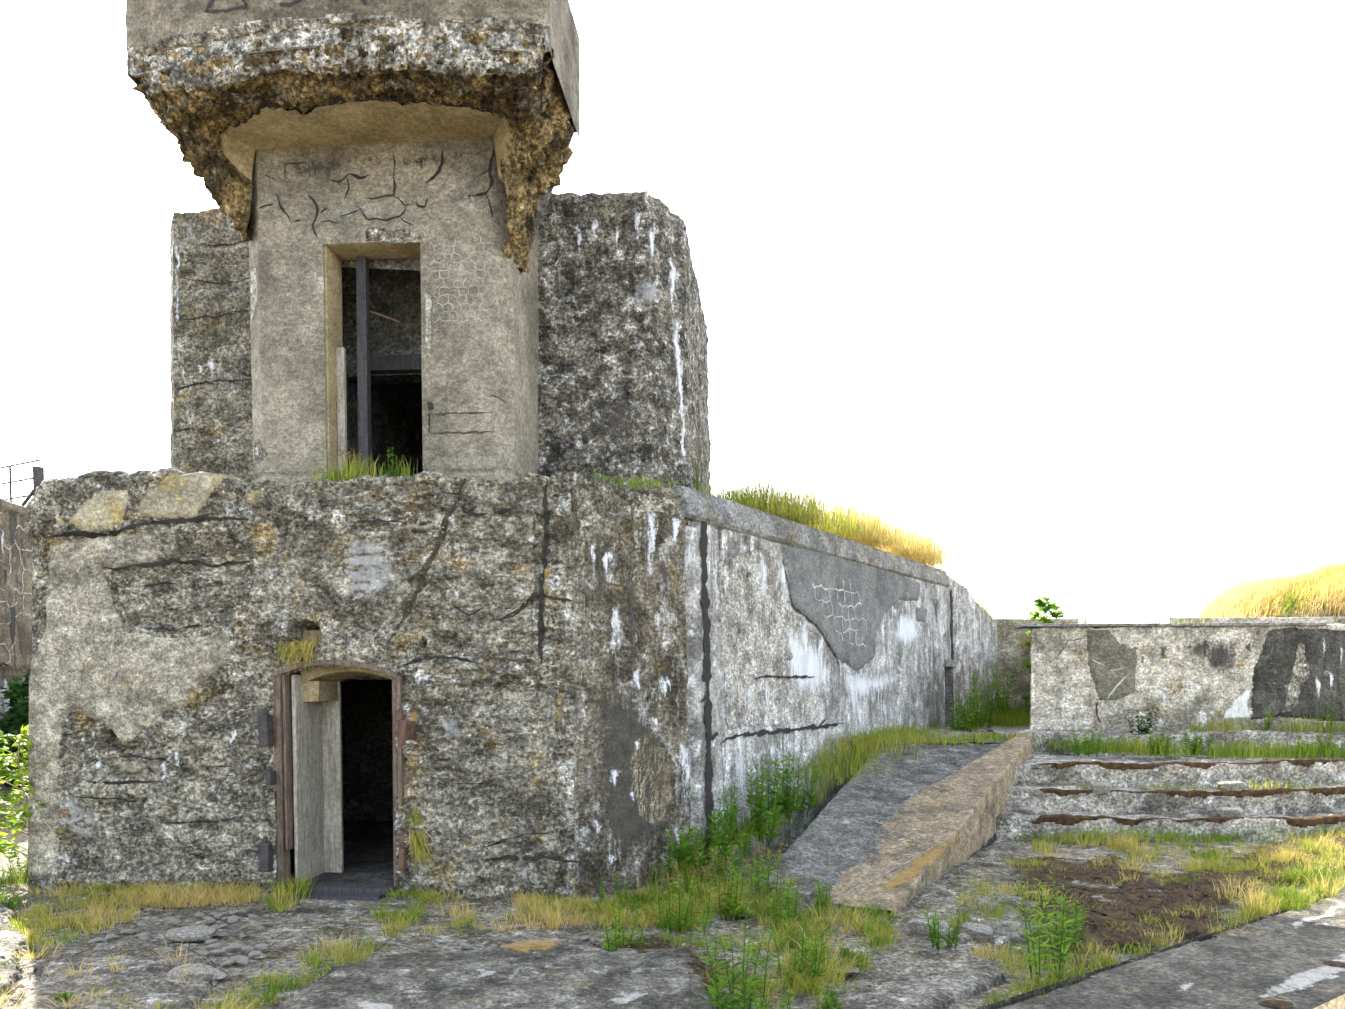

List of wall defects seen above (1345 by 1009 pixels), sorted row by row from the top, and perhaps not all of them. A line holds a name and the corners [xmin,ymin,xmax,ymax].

spalling [126,13,550,134]
crack [223,94,501,133]
crack [210,239,246,247]
crack [258,149,494,323]
spalling [365,227,422,243]
crack [179,277,250,320]
crack [175,379,252,391]
flaking render [0,470,561,890]